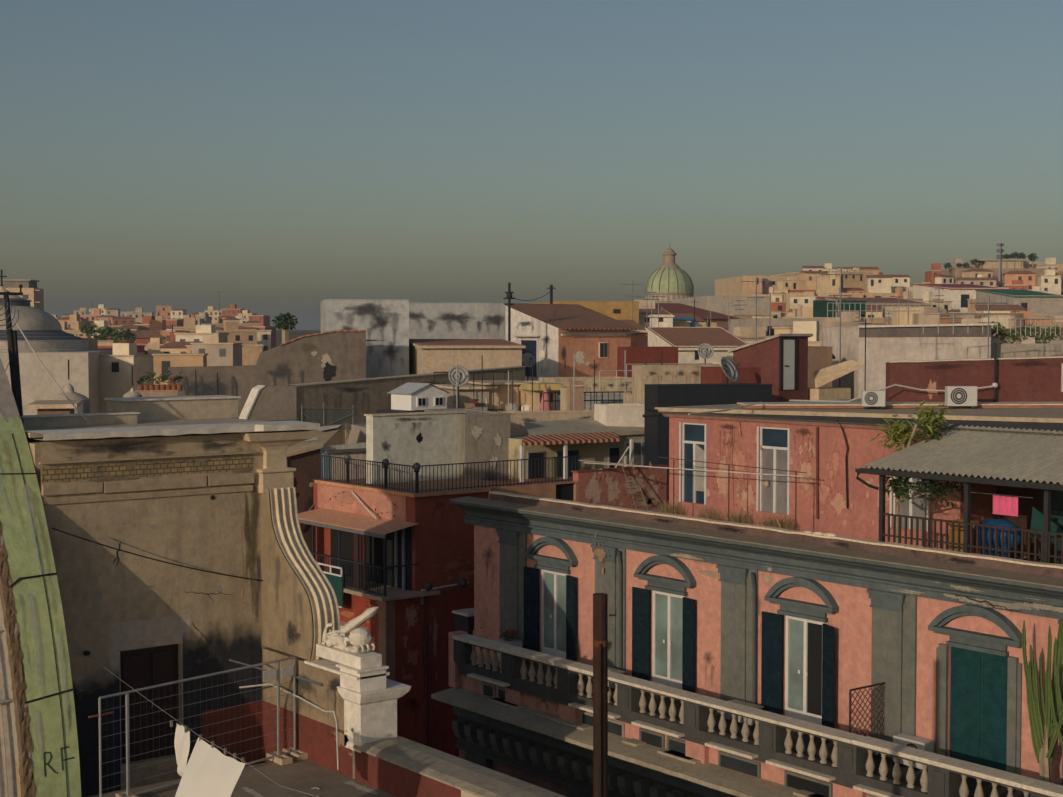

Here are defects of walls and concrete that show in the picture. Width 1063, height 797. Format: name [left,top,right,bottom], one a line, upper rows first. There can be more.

water stain [354,304,387,327]
water stain [441,314,469,322]
water stain [77,443,161,454]
peeling [489,462,667,509]
peeling [790,434,853,528]